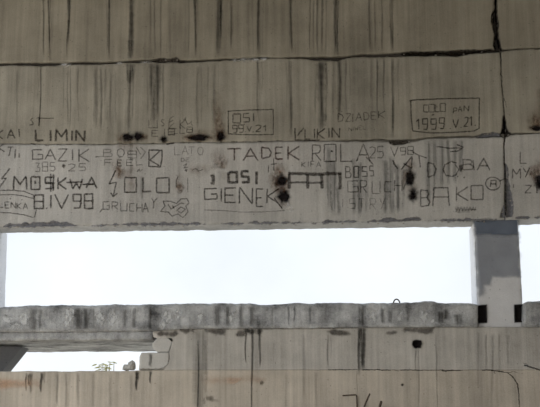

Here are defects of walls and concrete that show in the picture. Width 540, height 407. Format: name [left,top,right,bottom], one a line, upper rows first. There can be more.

rust [123,133,144,141]
rust [406,171,417,200]
crack [501,139,509,215]
leakage [245,329,262,407]